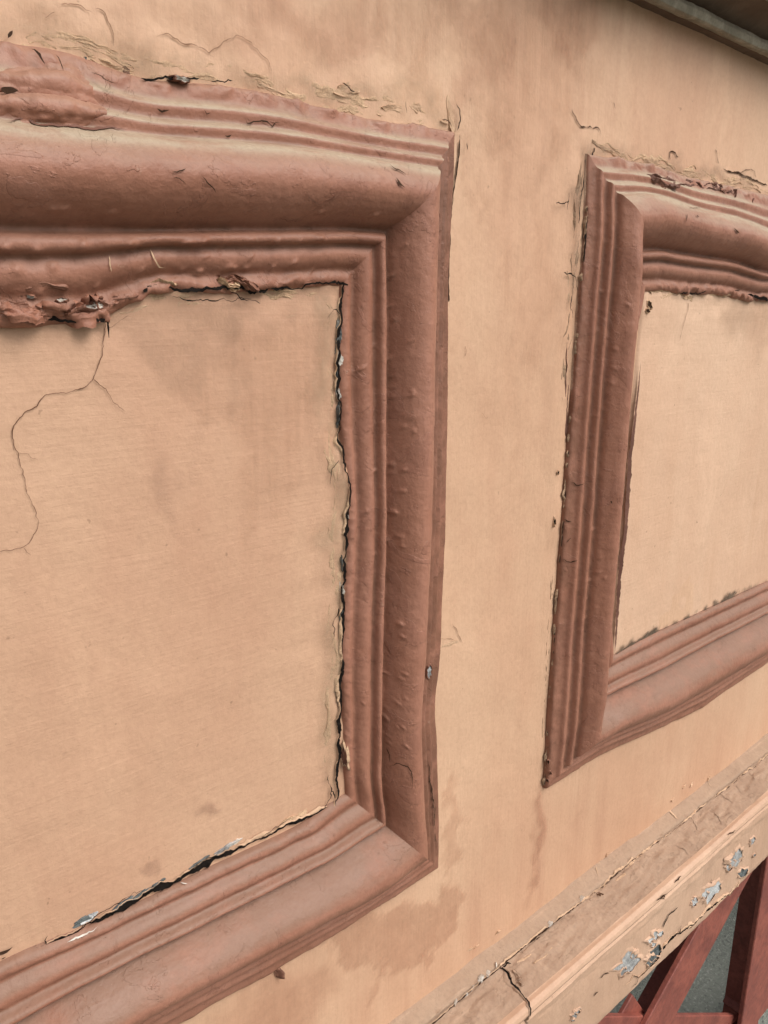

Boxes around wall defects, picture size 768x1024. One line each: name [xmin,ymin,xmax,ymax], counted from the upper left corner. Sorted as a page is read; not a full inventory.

peeling [80,56,135,76]
peeling [166,74,191,85]
flaking render [381,103,422,113]
peeling [647,173,737,197]
spalling [0,278,202,329]
peeling [216,274,317,317]
crack [3,316,127,554]
flaking render [47,286,350,943]
crack [432,754,768,1024]
peeling [689,835,756,908]
peeling [609,928,664,980]